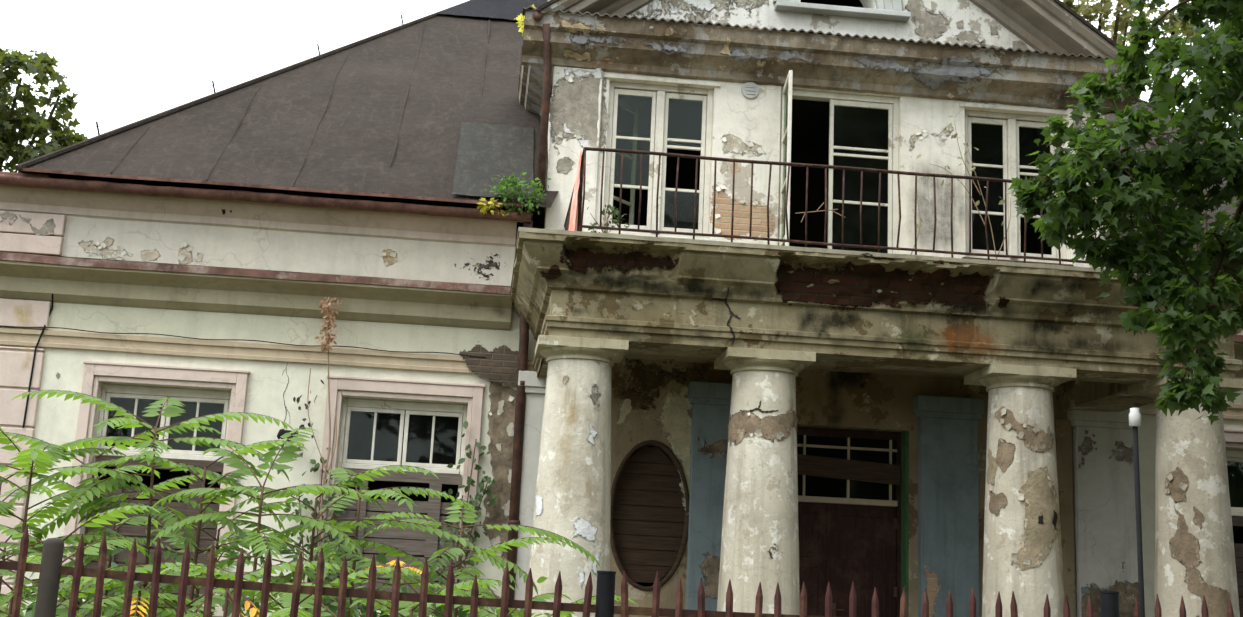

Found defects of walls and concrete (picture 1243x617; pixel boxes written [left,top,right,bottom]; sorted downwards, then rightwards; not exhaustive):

spalling [549,0,820,175]
peeling [854,0,1028,90]
flaking render [709,132,775,241]
peeling [78,237,161,263]
peeling [178,241,203,265]
crack [711,287,741,347]
damp [802,312,855,334]
peeling [656,386,798,515]
crack [740,400,778,413]
peeling [987,406,1060,571]
peeling [699,553,720,600]
peeling [1164,466,1235,617]